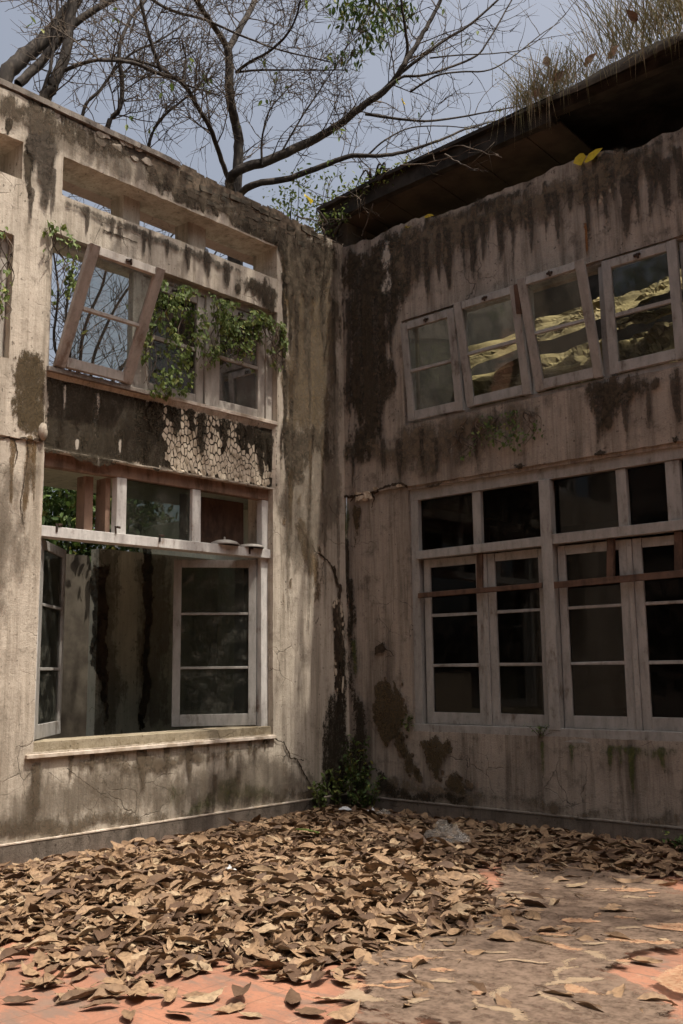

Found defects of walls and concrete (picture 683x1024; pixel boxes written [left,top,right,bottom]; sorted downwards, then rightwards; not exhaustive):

leakage [0,94,683,533]
peeling [135,398,277,489]
crack [275,738,312,787]
leakage [372,677,613,818]